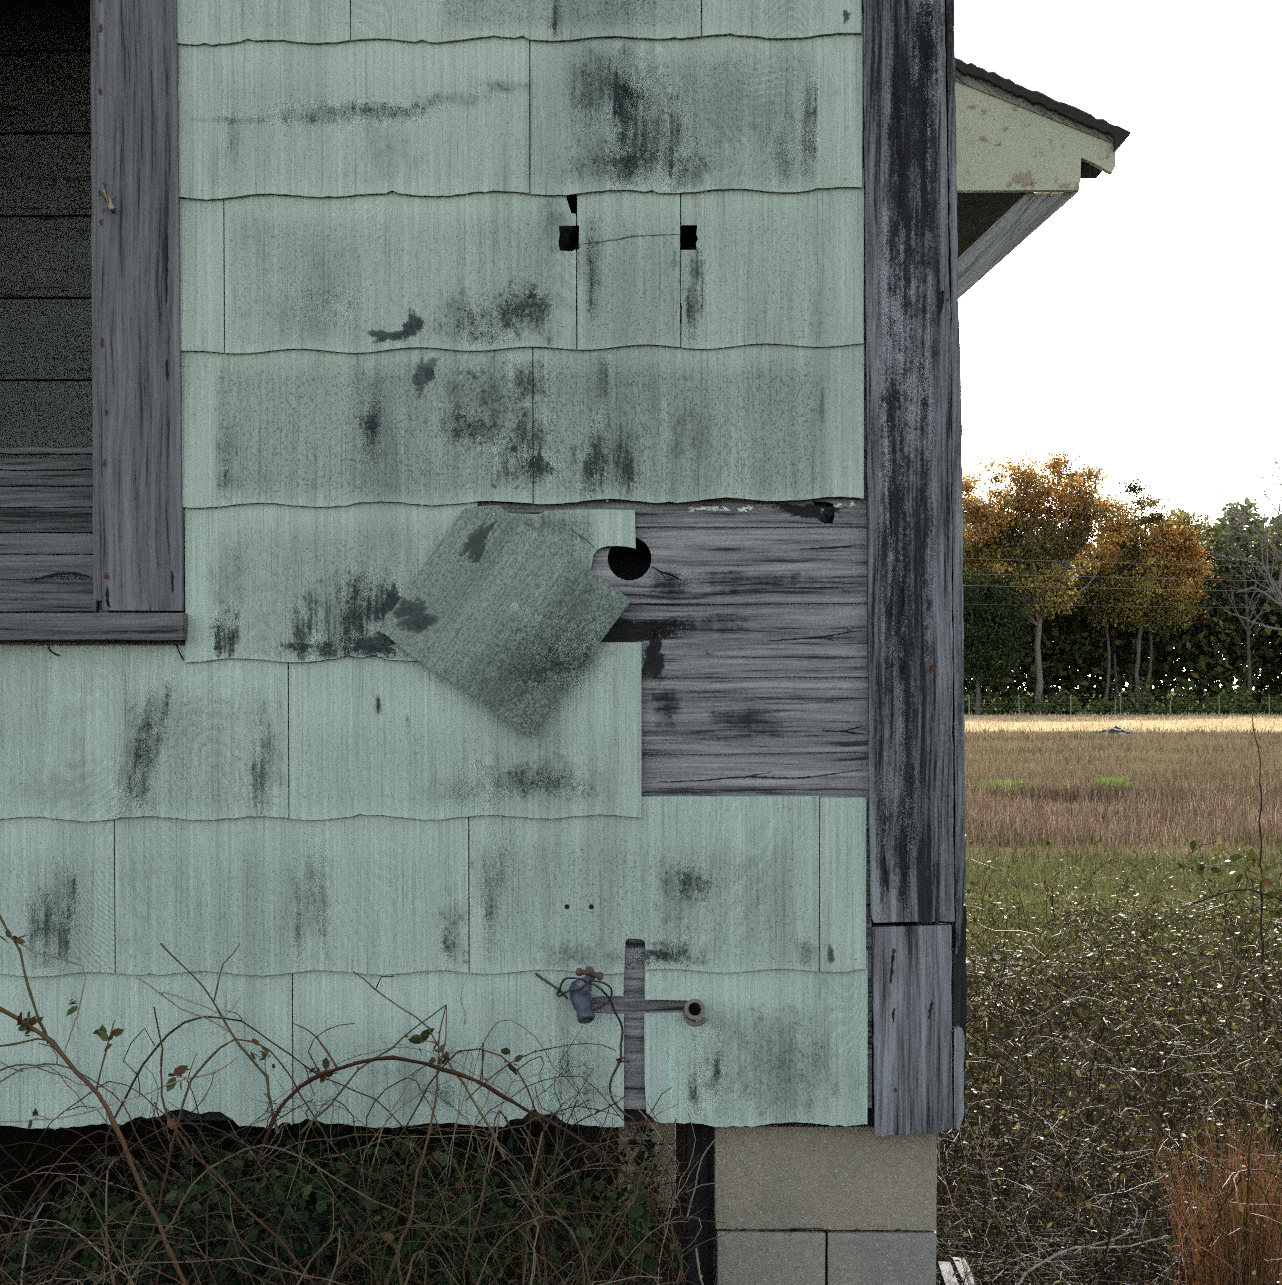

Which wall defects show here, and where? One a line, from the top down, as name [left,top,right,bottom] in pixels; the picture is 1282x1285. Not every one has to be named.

mould [574,44,708,186]
peeling [1006,171,1037,188]
mould [447,361,555,489]
mould [575,422,643,491]
mould [282,579,437,661]